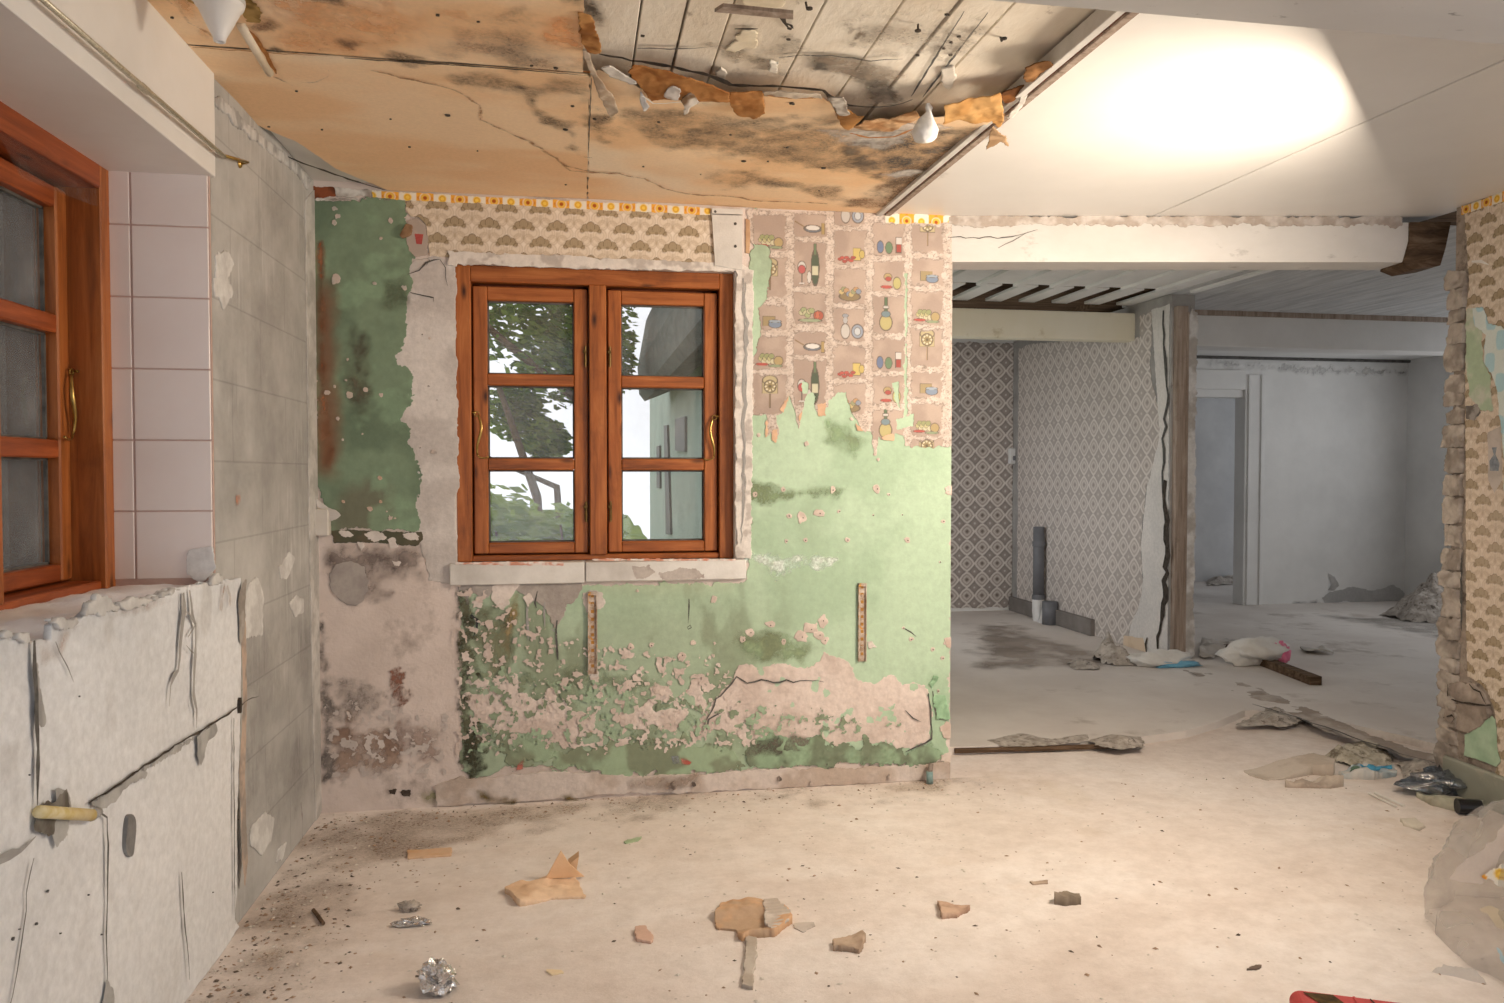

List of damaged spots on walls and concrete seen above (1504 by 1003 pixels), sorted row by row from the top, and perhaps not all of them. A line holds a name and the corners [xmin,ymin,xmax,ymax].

crack [194,47,592,158]
peeling [715,0,793,79]
water stain [782,29,905,104]
water stain [628,112,958,209]
peeling [214,96,438,566]
spalling [238,579,247,643]
water stain [327,547,420,594]
peeling [324,273,952,797]
spalling [1433,270,1501,769]
water stain [320,650,436,781]
crack [10,859,34,1003]
crack [181,872,190,980]